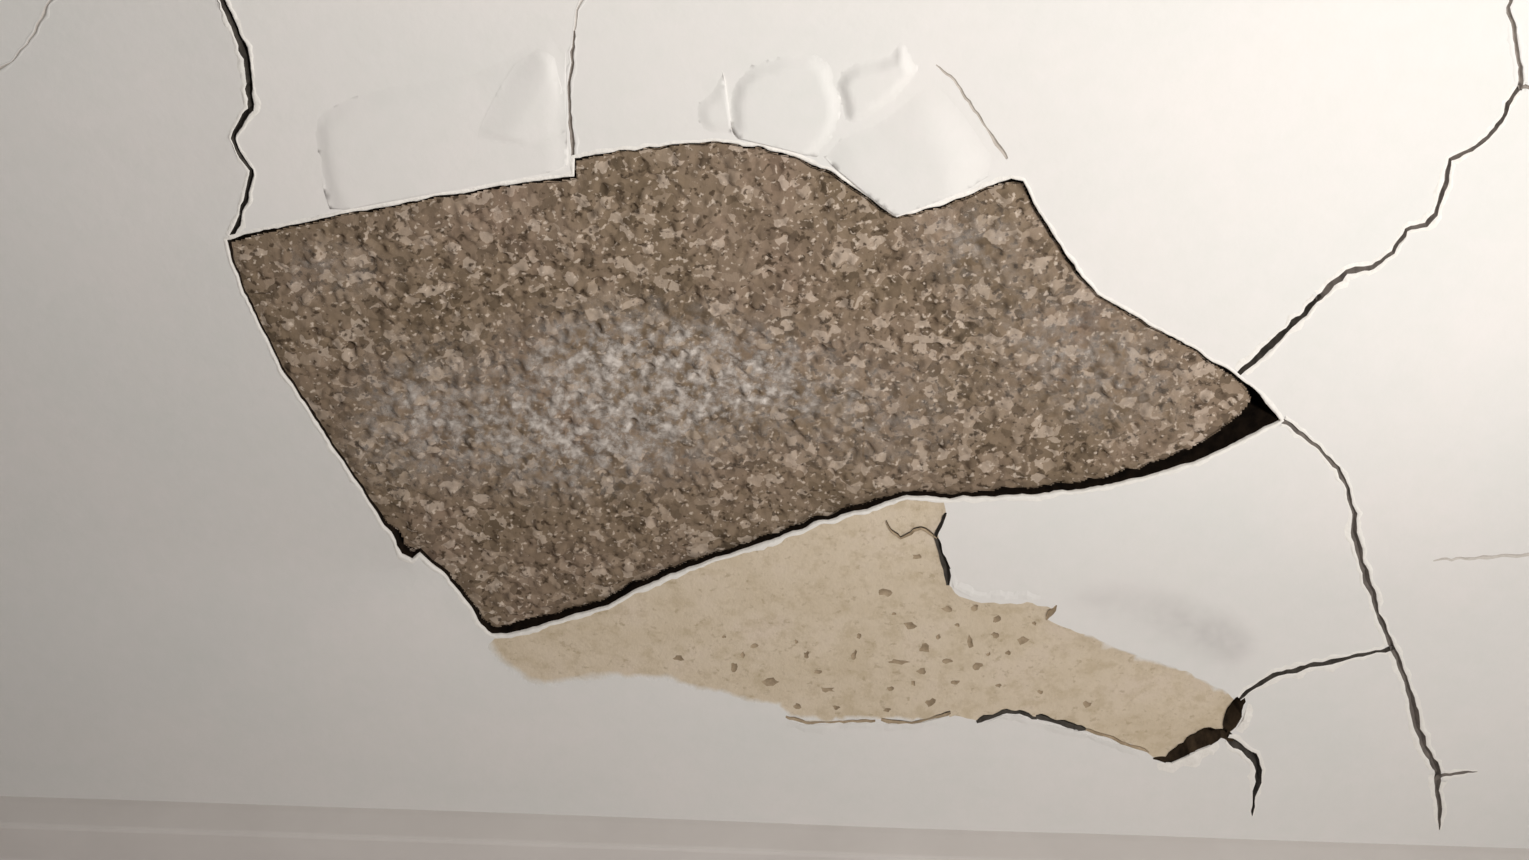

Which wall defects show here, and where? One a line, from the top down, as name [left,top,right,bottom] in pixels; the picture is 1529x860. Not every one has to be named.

crack [0,0,57,73]
crack [218,0,262,242]
crack [565,0,586,170]
crack [1235,0,1529,378]
flaking render [223,42,1284,773]
crack [1225,416,1477,830]